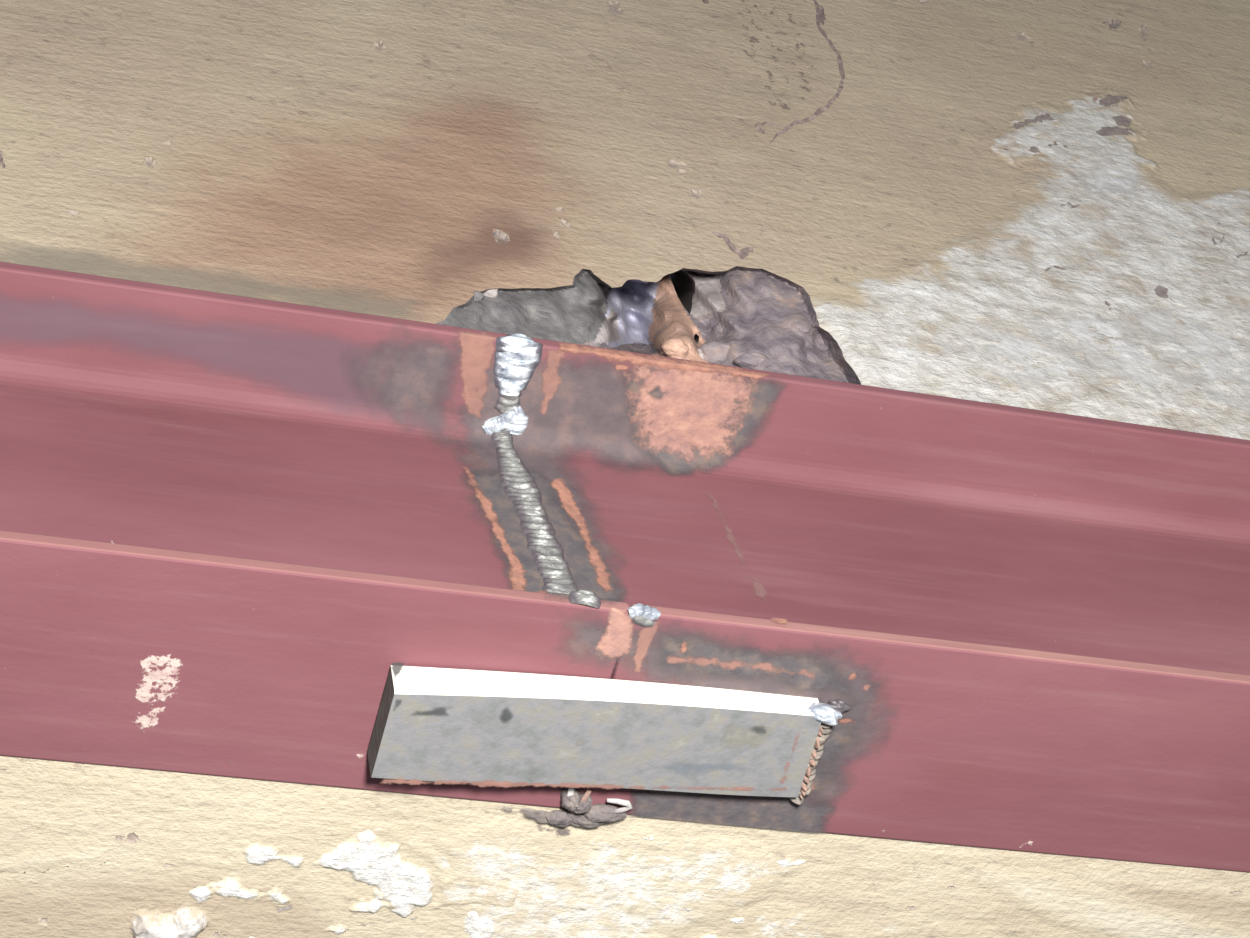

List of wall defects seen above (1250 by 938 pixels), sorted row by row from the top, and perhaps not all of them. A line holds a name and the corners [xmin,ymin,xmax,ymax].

crack [754,0,845,143]
leakage [807,81,1250,440]
rust [459,331,497,417]
spalling [436,266,861,385]
rust [541,343,767,461]
rust [464,468,547,593]
rust [551,479,611,591]
rust [596,608,659,672]
leakage [428,814,950,938]